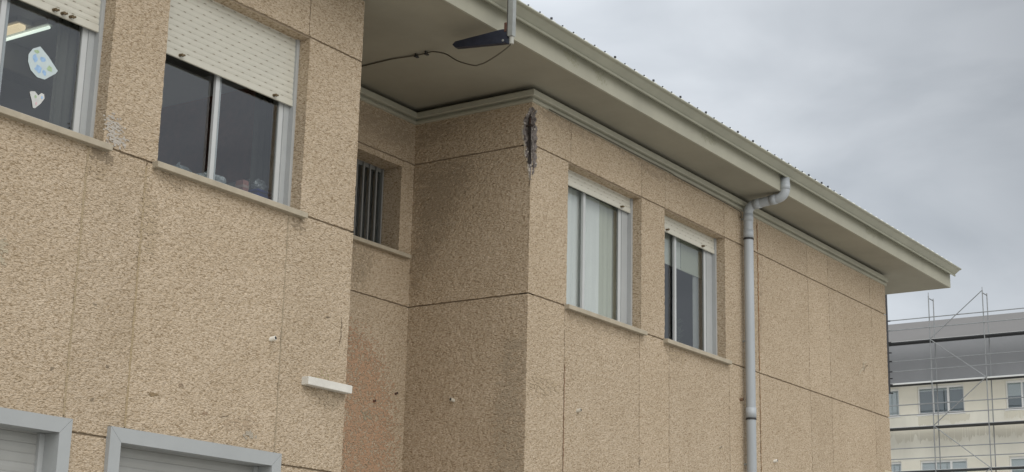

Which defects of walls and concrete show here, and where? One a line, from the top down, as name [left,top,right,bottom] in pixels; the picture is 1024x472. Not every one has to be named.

spalling [522,107,538,180]